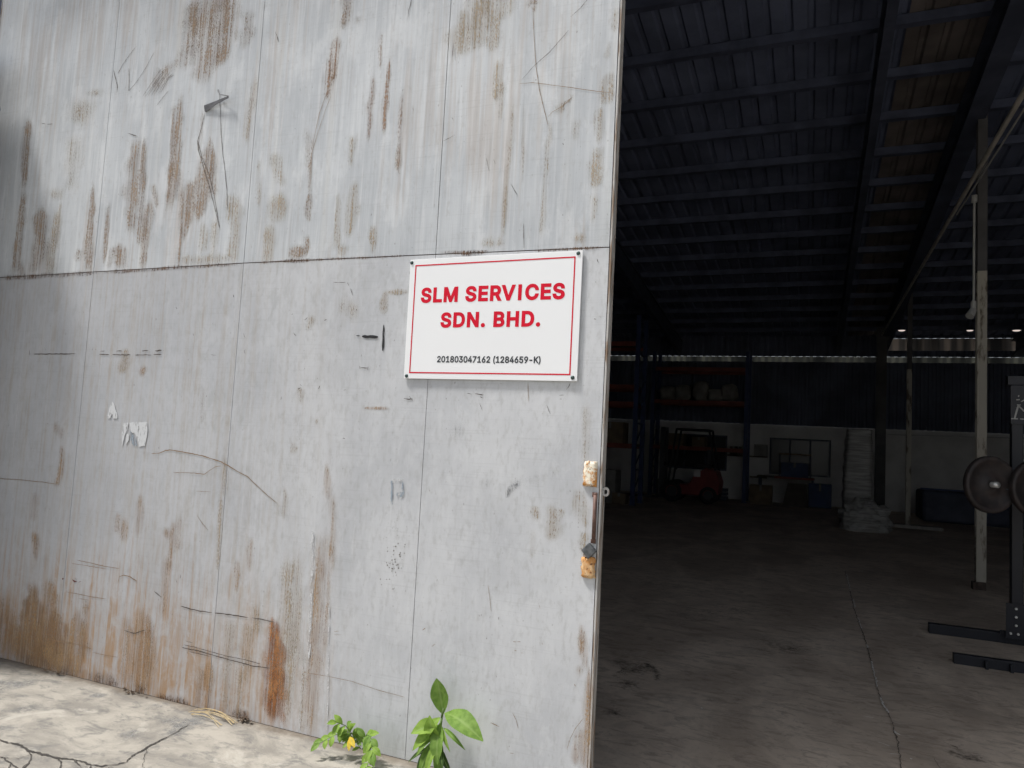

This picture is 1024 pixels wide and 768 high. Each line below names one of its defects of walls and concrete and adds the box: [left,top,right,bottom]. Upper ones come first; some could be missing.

rust [154,0,253,87]
rust [455,0,511,51]
rust [367,49,390,129]
rust [7,102,239,280]
rust [264,187,398,263]
peeling [122,422,148,447]
rust [198,549,332,728]
crack [845,572,902,768]
crack [0,726,186,768]